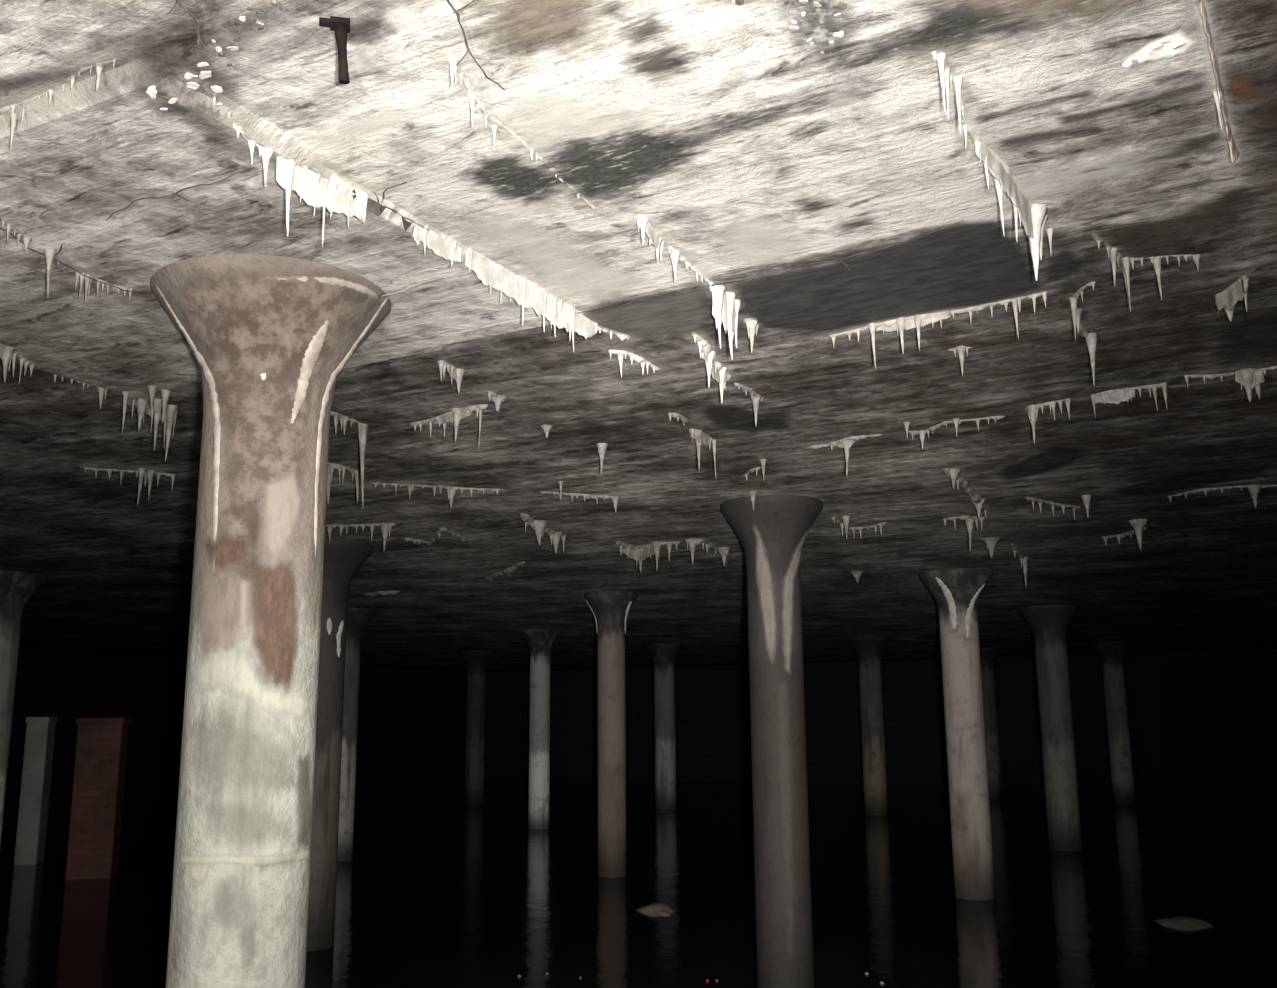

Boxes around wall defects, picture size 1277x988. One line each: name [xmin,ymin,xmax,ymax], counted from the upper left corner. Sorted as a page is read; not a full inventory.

crack [447,0,505,91]
water stain [213,97,367,245]
water stain [410,0,1255,479]
water stain [0,342,37,383]
water stain [1183,275,1277,402]
water stain [53,374,178,506]
water stain [152,285,221,572]
corrosion [182,275,374,690]
water stain [830,516,887,538]
water stain [942,468,1029,587]
water stain [1025,495,1092,520]
water stain [1101,519,1148,551]